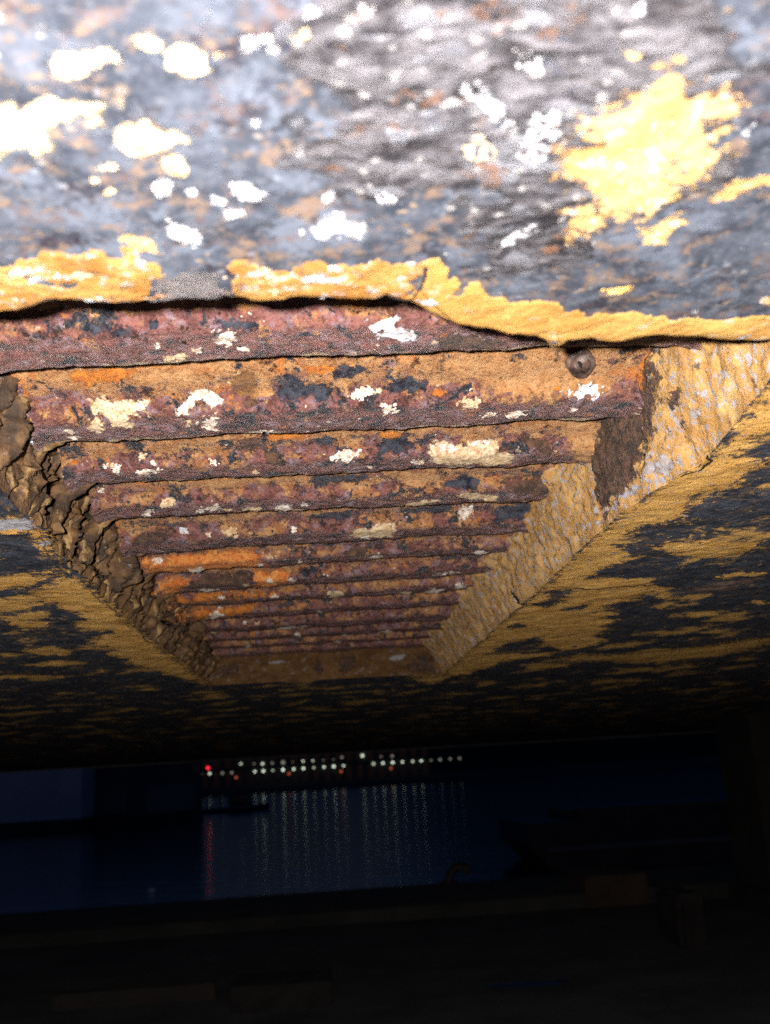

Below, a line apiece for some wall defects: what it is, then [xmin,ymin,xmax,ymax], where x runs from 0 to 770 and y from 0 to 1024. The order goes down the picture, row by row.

spalling [211,0,770,347]
peeling [0,235,169,311]
peeling [64,394,150,441]
rust [70,366,210,389]
peeling [175,389,224,431]
rust [229,362,372,409]
rust [387,333,622,408]
rust [523,346,664,520]
rust [384,468,480,492]
peeling [399,373,770,684]
peeling [0,518,210,685]
rust [132,529,322,623]